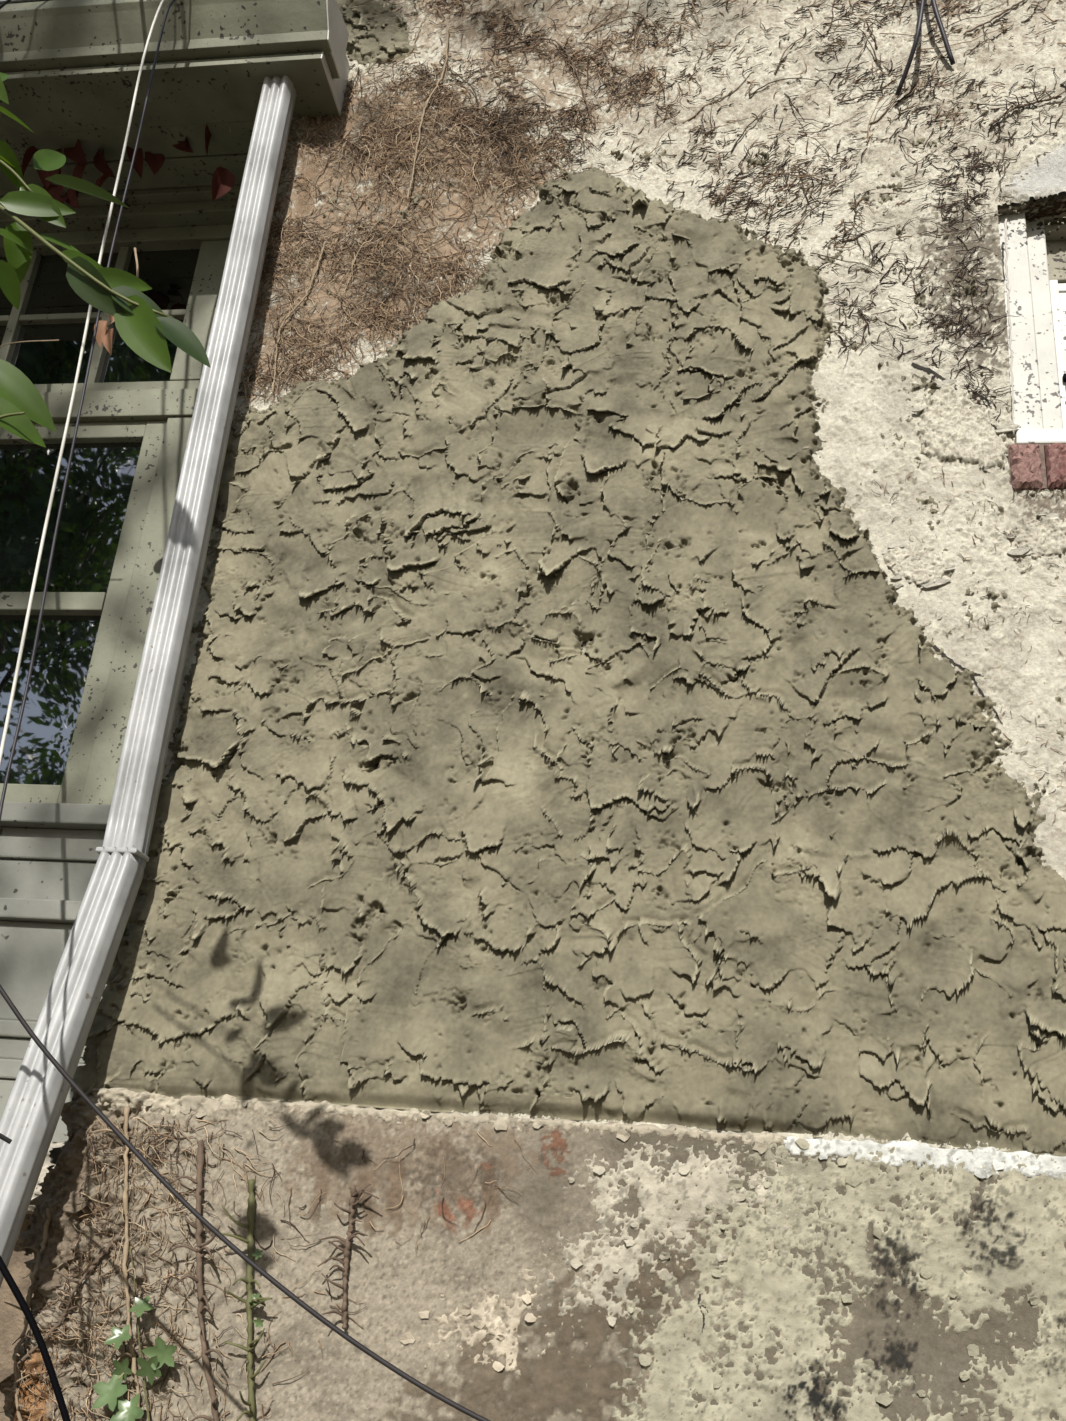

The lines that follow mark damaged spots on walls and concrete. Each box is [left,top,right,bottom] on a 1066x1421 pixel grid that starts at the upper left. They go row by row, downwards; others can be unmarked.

peeling [17,1087,1066,1421]
damp [864,1230,920,1379]
damp [962,1199,1024,1273]
damp [784,1360,846,1421]